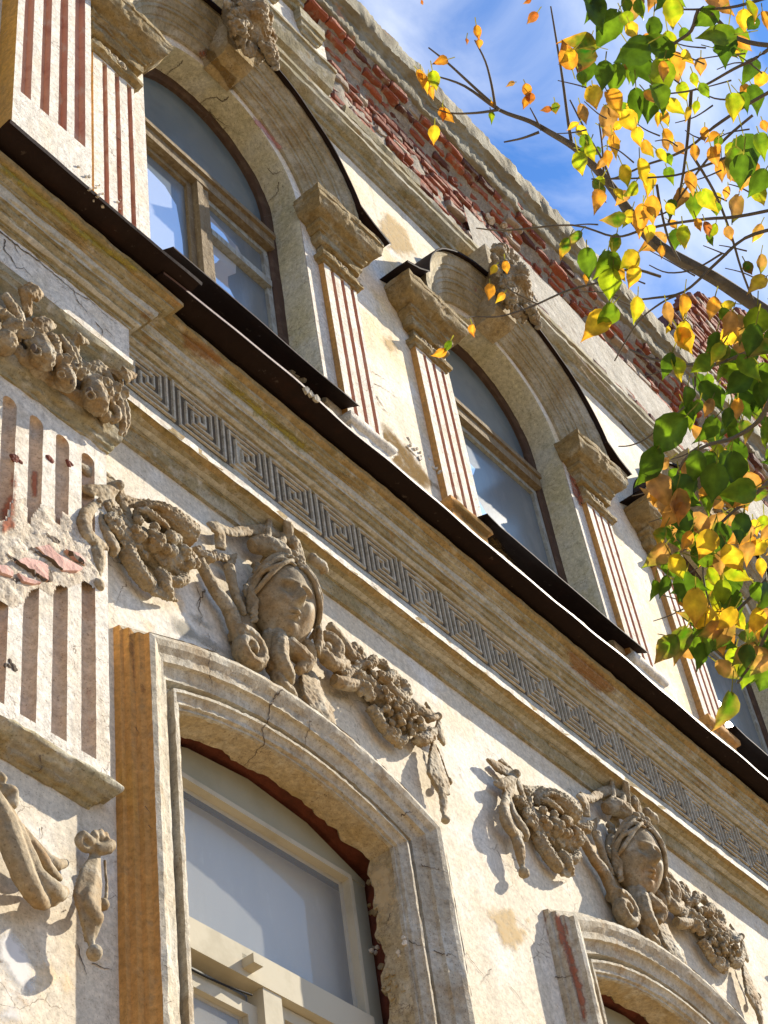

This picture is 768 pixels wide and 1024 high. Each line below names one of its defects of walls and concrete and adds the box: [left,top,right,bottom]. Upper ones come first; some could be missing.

flaking render [303,0,606,318]
flaking render [572,349,656,428]
flaking render [598,323,731,450]
flaking render [747,453,768,507]
flaking render [0,498,104,608]
crack [243,689,283,768]
peeling [369,935,407,1002]